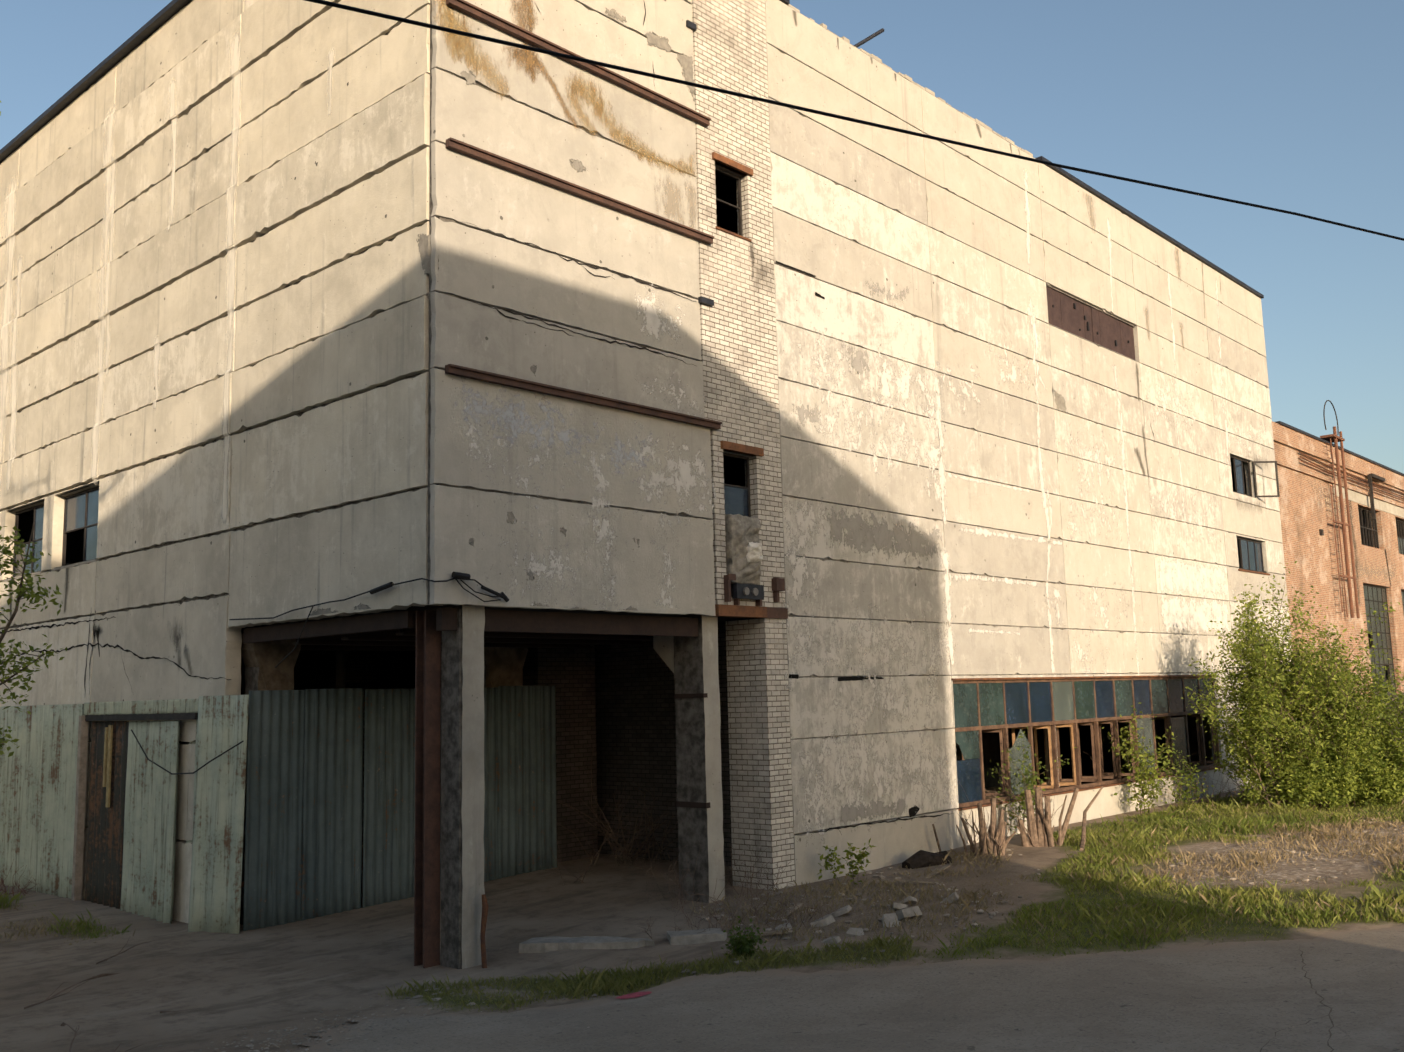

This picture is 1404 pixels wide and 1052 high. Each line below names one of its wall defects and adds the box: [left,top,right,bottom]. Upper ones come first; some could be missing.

rust [439,0,507,97]
rust [513,0,534,32]
rust [510,49,693,173]
crack [467,222,697,302]
spalling [776,261,825,299]
crack [456,295,696,366]
peeling [625,421,719,609]
peeling [824,506,942,564]
water stain [933,298,1062,673]
water stain [1113,366,1149,676]
crack [0,615,231,695]
peeling [792,730,957,841]